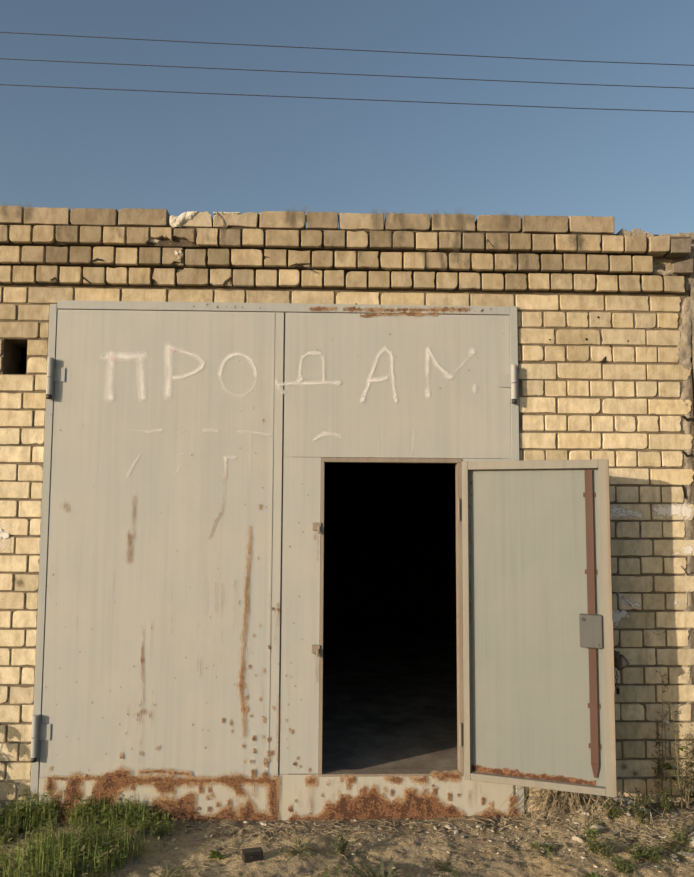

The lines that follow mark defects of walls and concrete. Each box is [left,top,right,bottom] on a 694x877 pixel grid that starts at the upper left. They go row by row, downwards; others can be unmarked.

rust [310,303,470,318]
rust [33,527,521,824]
rust [471,764,596,786]